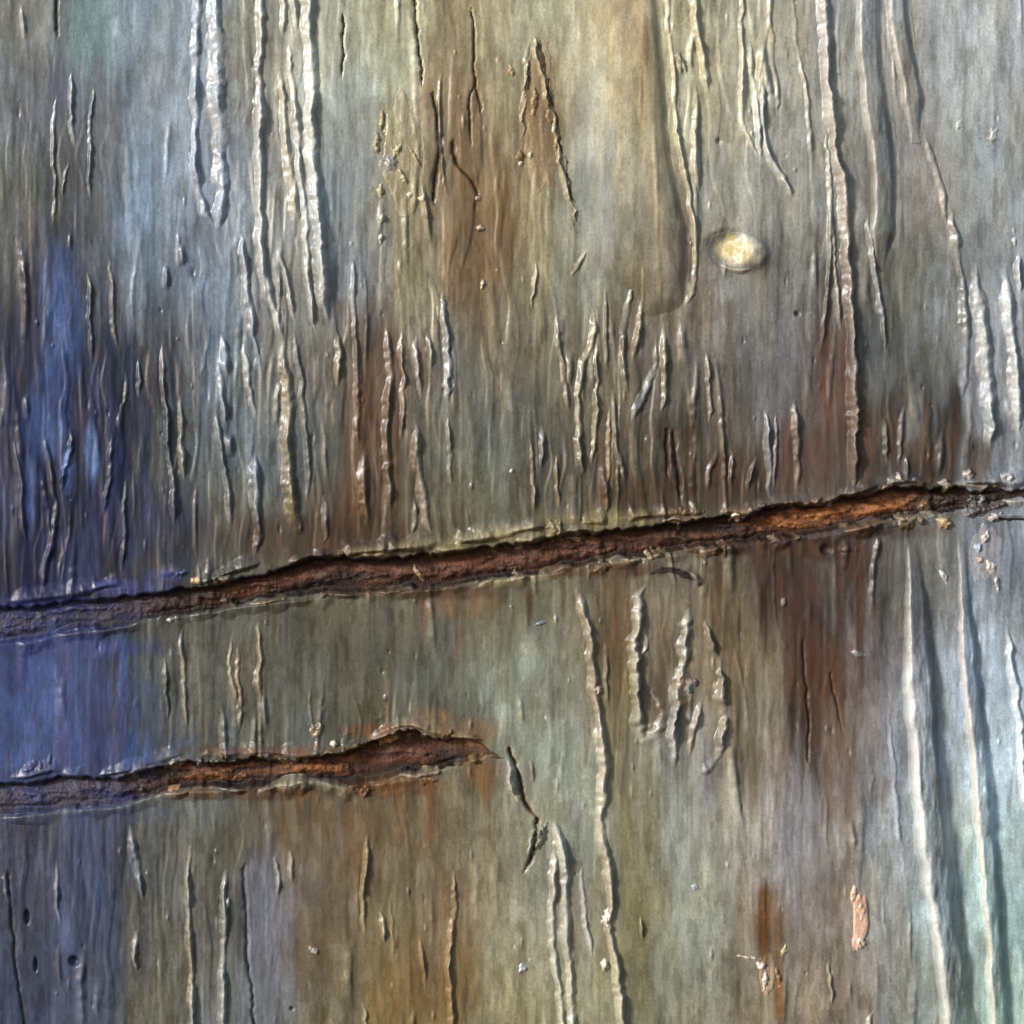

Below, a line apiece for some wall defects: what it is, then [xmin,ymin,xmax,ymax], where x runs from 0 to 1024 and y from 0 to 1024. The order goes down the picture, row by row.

crack [0,429,1024,658]
crack [0,712,548,874]
corrosion [757,890,781,956]
spalling [849,885,869,951]
corrosion [775,963,783,1018]